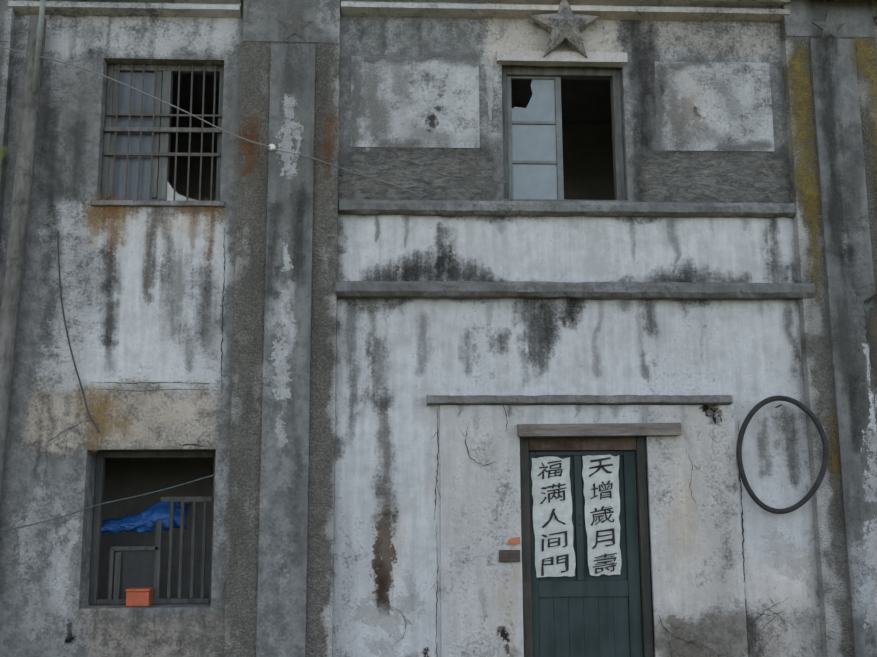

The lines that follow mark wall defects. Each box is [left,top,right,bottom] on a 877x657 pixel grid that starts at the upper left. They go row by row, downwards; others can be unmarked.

peeling [276,94,304,179]
damp [101,248,114,346]
damp [143,207,163,301]
rust [207,207,215,260]
peeling [280,239,294,272]
damp [364,223,504,282]
damp [515,299,551,368]
spalling [699,404,722,426]
peeling [861,307,877,503]
spalling [370,491,398,616]
crack [429,413,441,656]
peeling [854,515,877,632]